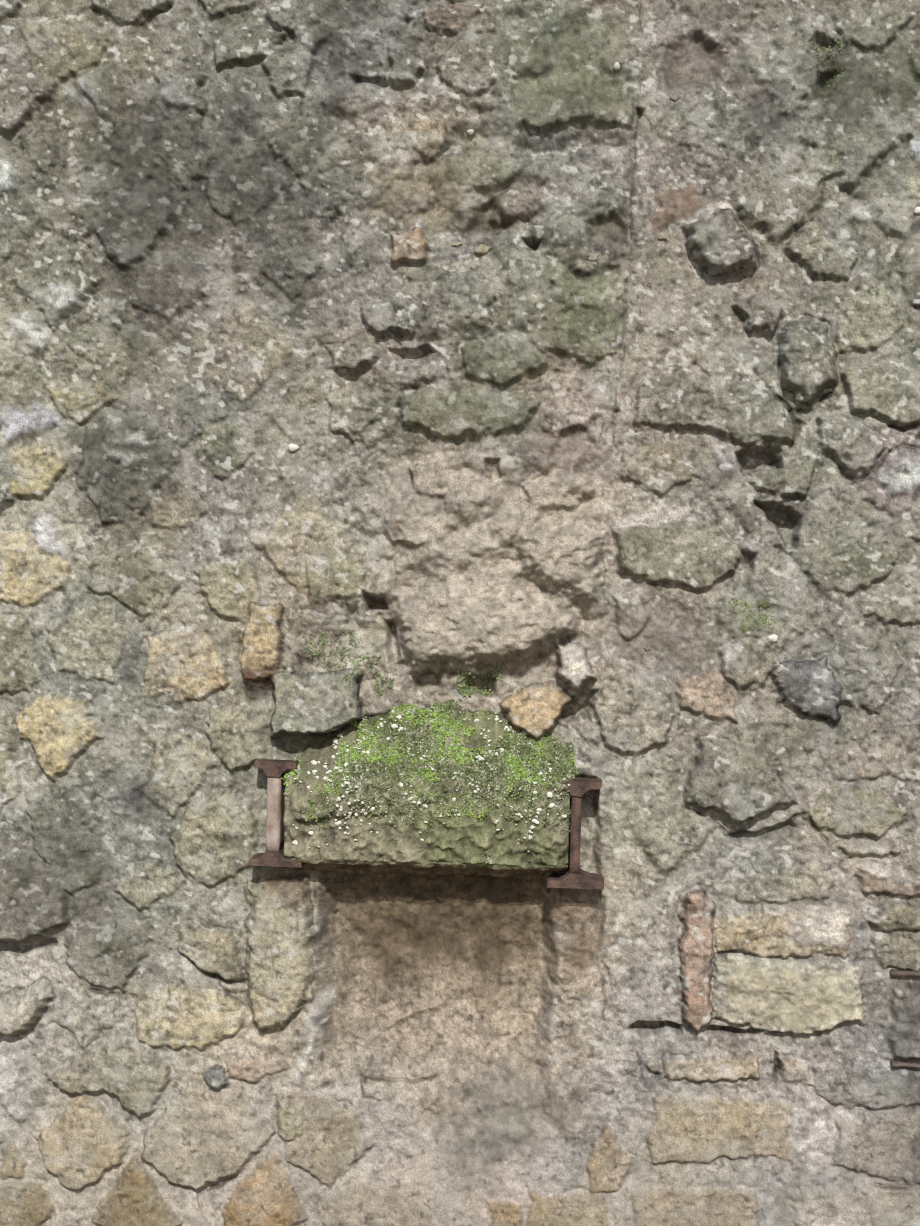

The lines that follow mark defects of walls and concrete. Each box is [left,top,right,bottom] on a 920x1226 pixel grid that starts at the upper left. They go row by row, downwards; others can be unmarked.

damp [351,874,529,978]